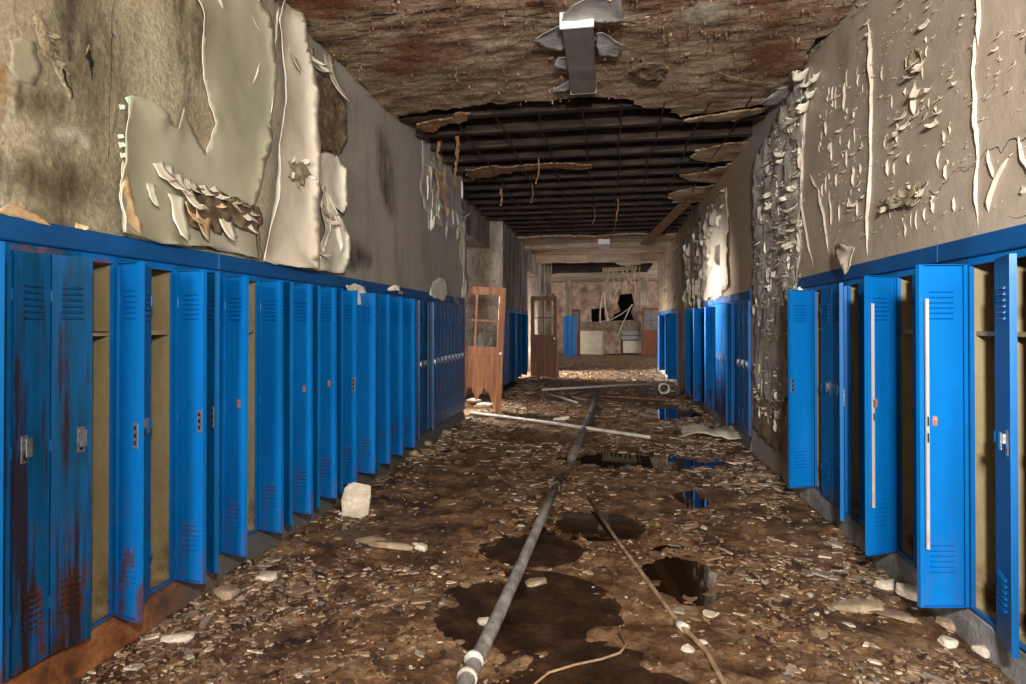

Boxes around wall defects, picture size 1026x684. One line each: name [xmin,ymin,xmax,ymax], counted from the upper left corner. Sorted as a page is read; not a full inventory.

flaking render [32,11,74,101]
peeling [941,29,1026,106]
peeling [117,0,367,305]
flaking render [420,139,472,301]
flaking render [751,0,950,460]